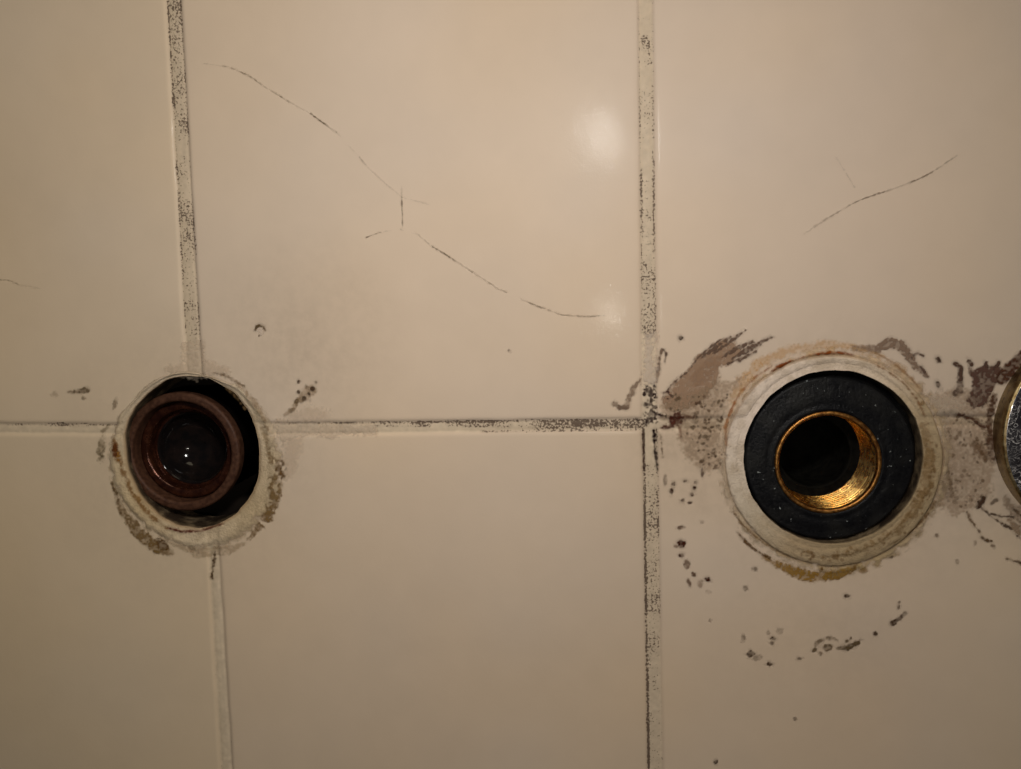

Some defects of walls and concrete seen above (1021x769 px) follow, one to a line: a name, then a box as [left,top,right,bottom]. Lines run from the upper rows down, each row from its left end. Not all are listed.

leakage [642,330,773,471]
leakage [942,394,997,460]
rust [111,440,169,555]
rust [250,453,285,537]
leakage [977,496,1021,537]
leakage [677,526,710,585]
leakage [812,637,860,652]